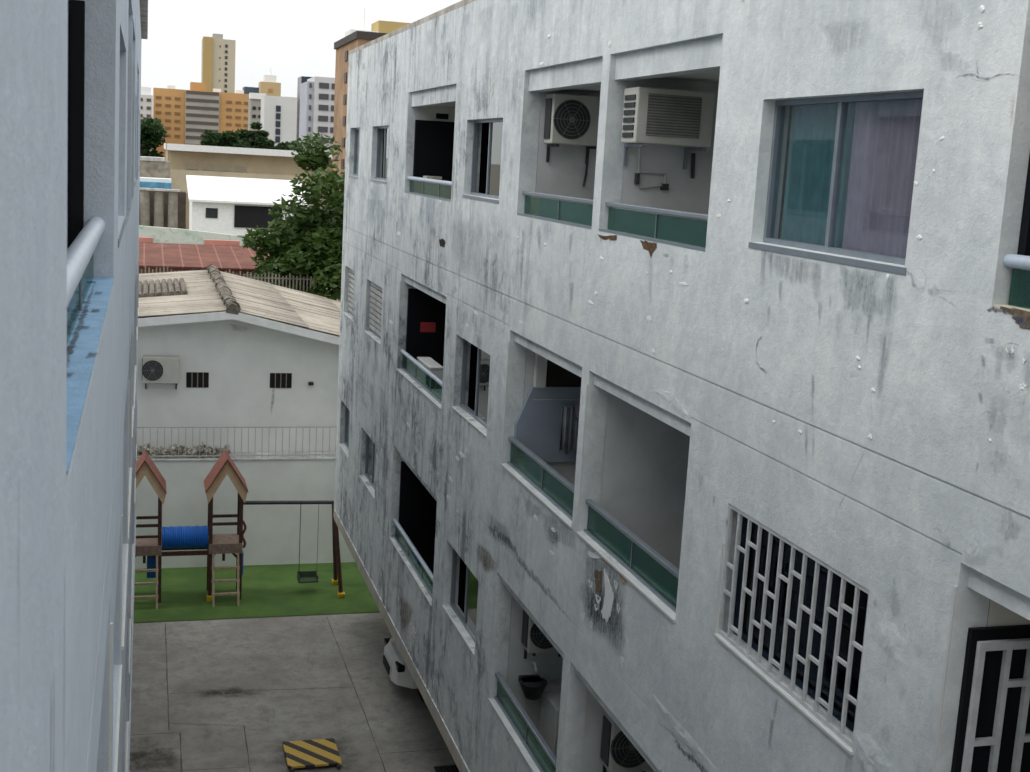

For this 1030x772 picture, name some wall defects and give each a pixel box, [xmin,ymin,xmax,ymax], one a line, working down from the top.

corrosion [640,240,657,257]
spalling [1000,306,1030,329]
peeling [580,551,627,640]